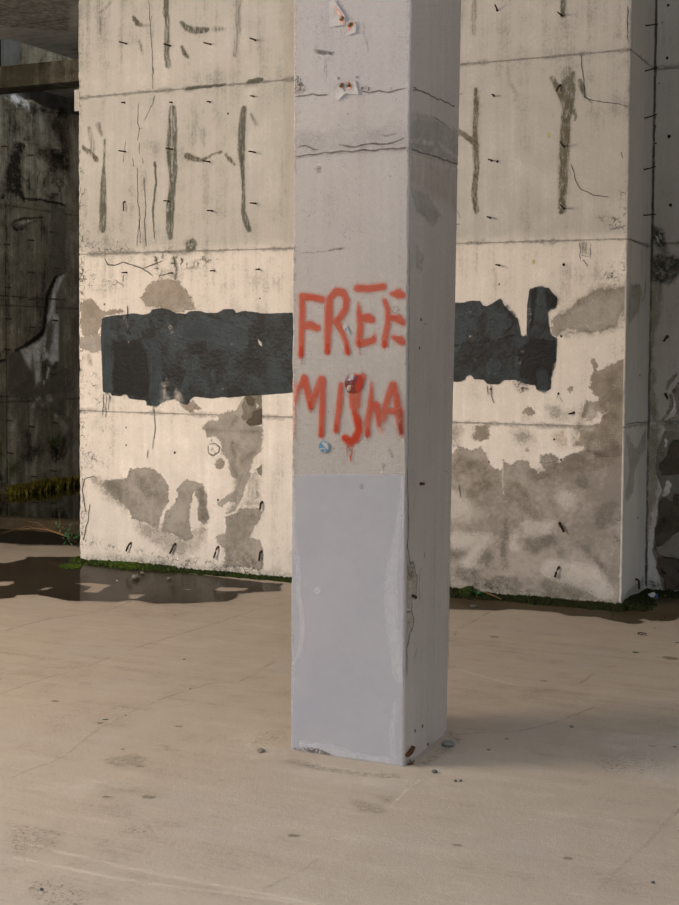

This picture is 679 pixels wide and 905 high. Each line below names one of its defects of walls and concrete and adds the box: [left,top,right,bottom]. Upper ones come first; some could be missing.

crack [295,76,327,97]
crack [361,85,455,123]
crack [0,273,64,362]
damp [7,205,67,416]
damp [80,299,123,353]
flaking render [81,467,209,553]
spalling [407,557,416,644]